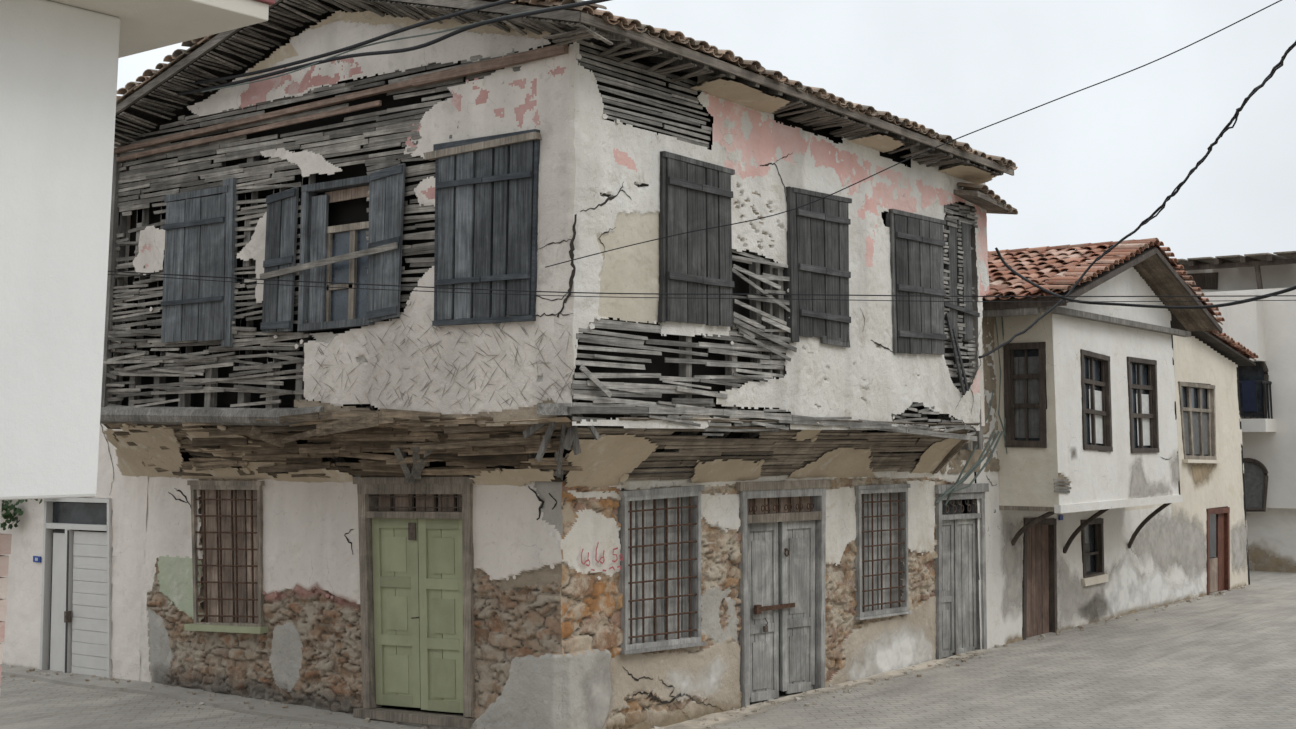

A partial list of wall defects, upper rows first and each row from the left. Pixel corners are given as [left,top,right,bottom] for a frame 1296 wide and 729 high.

peeling [240,10,551,109]
peeling [451,42,593,128]
crack [535,183,632,318]
peeling [613,148,649,187]
peeling [703,91,990,298]
peeling [391,398,557,426]
spalling [146,466,363,710]
spalling [472,470,623,720]
spalling [642,517,742,654]
spalling [825,476,955,687]
leakage [1057,512,1207,631]
crack [623,667,723,717]